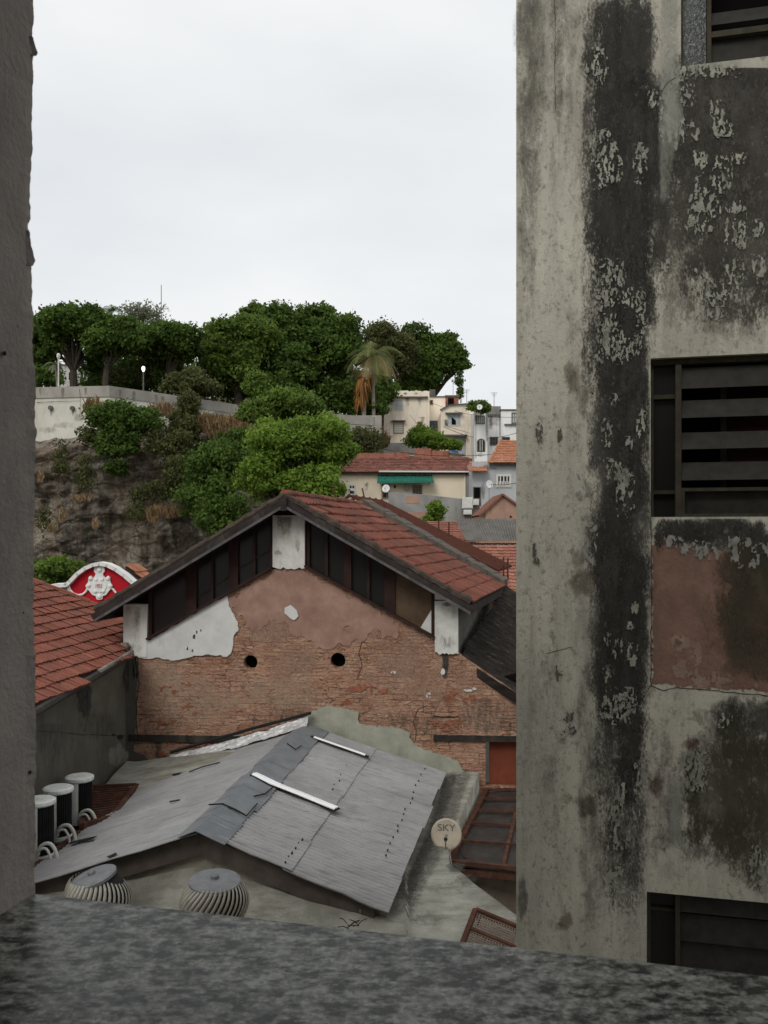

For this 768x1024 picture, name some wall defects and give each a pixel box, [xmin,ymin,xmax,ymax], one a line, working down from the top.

peeling [582,47,608,85]
peeling [591,128,648,190]
peeling [593,258,647,365]
water stain [567,0,768,906]
peeling [112,569,404,762]
spalling [600,535,768,725]
peeling [306,684,465,773]